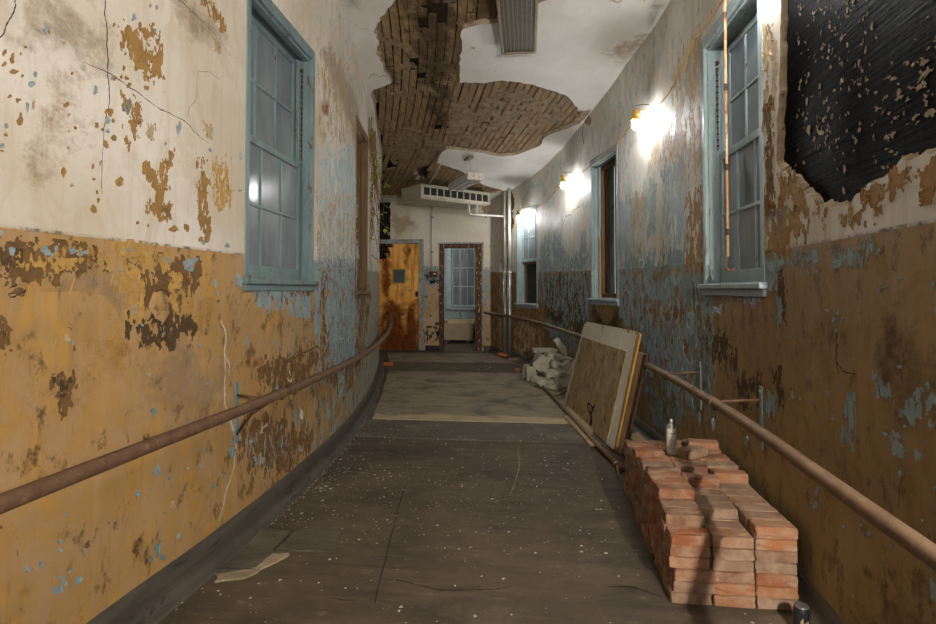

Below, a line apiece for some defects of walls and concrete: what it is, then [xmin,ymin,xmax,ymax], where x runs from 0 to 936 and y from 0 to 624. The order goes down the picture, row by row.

crack [0,1,16,38]
peeling [0,94,35,152]
peeling [2,45,38,88]
crack [85,0,219,188]
peeling [95,13,243,245]
flaking render [371,0,591,259]
flaking render [0,230,202,356]
peeling [228,47,372,479]
peeling [481,190,515,307]
flaking render [616,0,936,434]
peeling [49,369,78,421]
peeling [872,370,936,477]